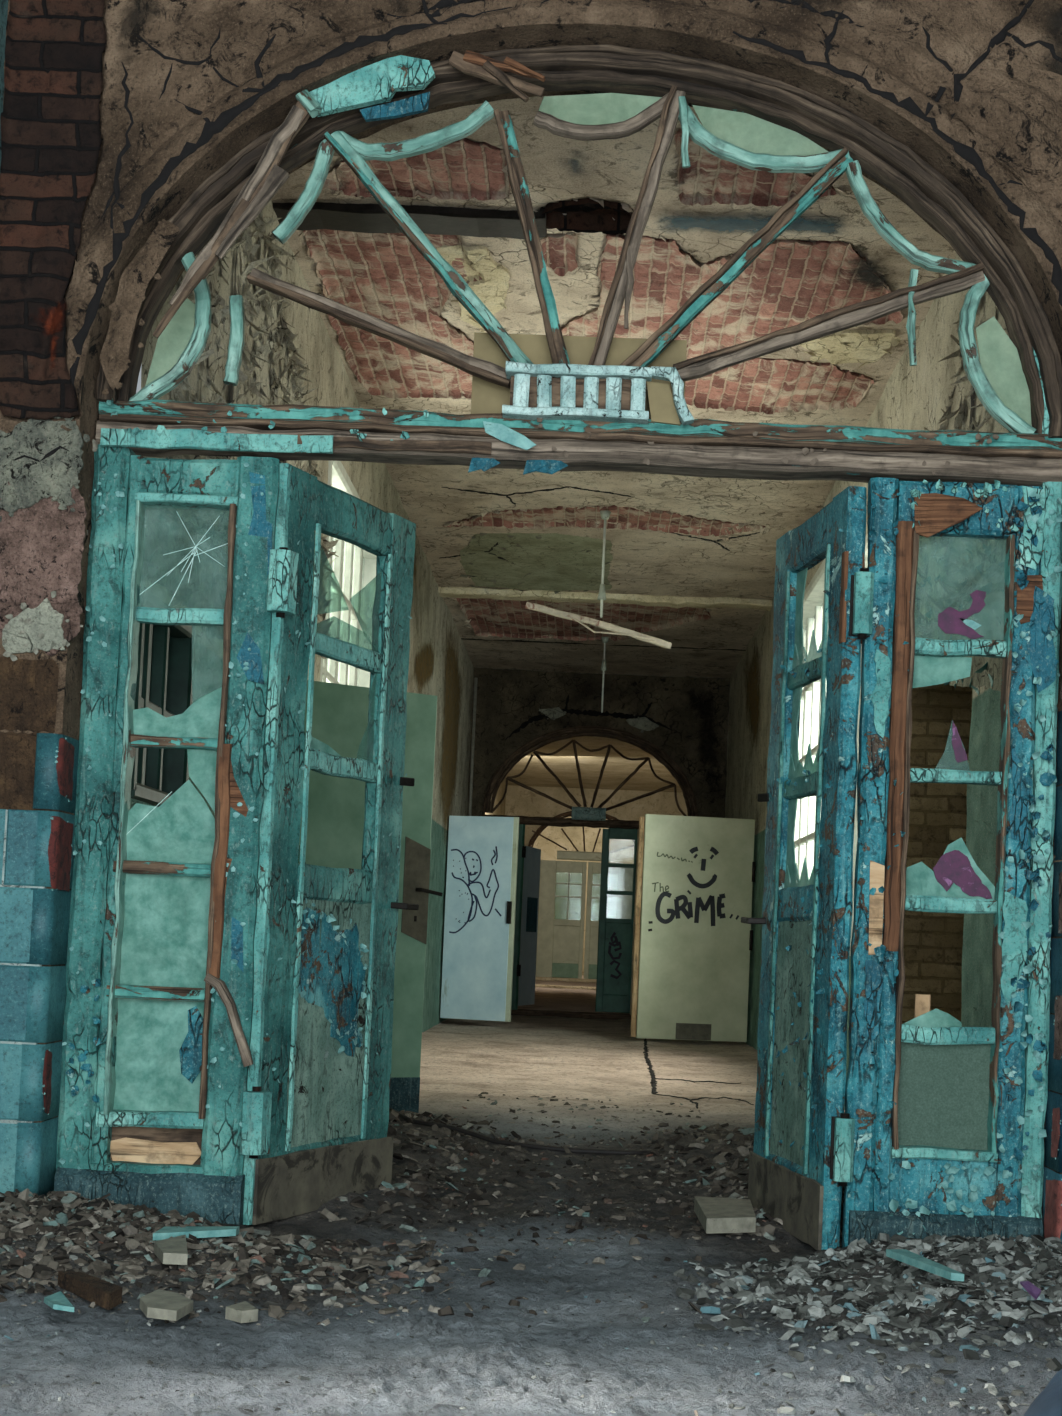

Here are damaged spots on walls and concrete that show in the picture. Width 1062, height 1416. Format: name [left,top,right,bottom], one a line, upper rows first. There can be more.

flaking render [0,0,125,892]
crack [4,0,549,470]
flaking render [166,210,510,499]
peeling [443,505,773,641]
flaking render [540,232,742,339]
flaking render [674,240,891,360]
flaking render [685,311,903,416]
crack [733,0,1062,306]
peeling [869,461,1062,716]
crack [505,695,677,740]
crack [643,1038,754,1109]
peeling [853,744,1062,1239]